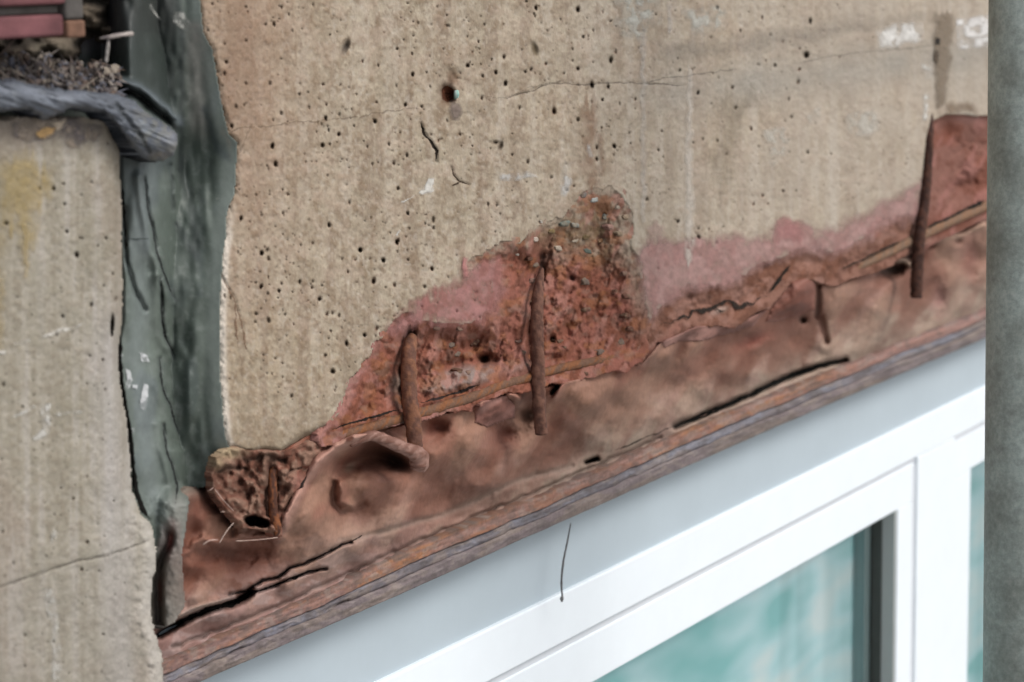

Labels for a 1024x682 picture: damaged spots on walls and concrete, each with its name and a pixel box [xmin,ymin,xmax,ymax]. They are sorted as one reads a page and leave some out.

crack [421,123,467,186]
corrosion [392,258,505,331]
spalling [204,114,987,538]
corrosion [640,185,920,316]
crack [332,384,480,430]
crack [620,359,844,449]
crack [156,535,362,638]